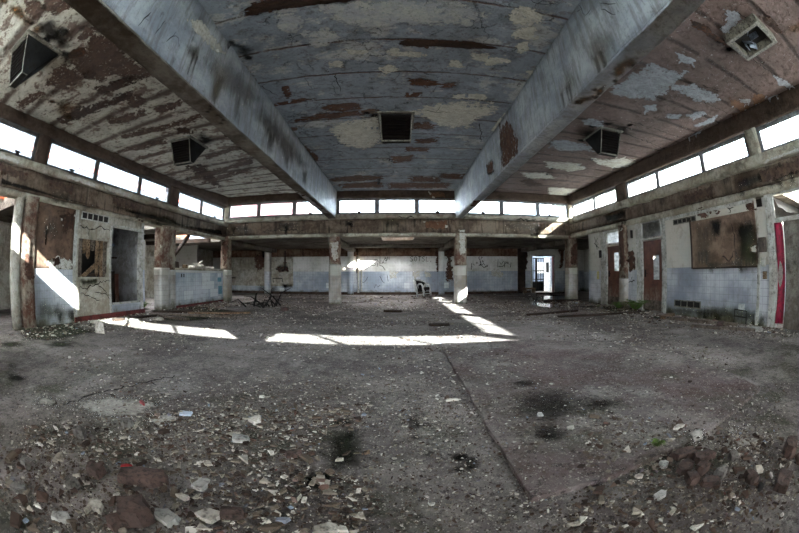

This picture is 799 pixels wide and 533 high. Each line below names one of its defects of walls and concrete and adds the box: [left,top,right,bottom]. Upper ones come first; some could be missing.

peeling [24,0,72,23]
peeling [244,0,493,55]
spalling [379,38,511,76]
peeling [15,26,204,160]
peeling [274,85,382,150]
peeling [388,77,518,176]
peeling [609,52,795,127]
peeling [185,135,254,188]
peeling [520,139,635,196]
peeling [618,225,636,272]
leakage [698,220,759,270]
crack [80,280,109,301]